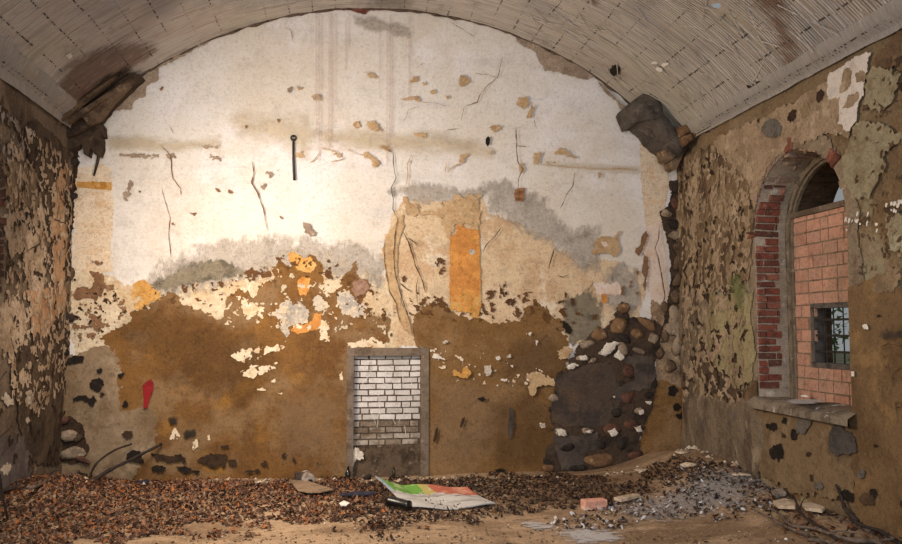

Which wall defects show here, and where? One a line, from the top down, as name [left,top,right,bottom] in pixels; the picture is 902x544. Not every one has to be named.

water stain [82,68,133,108]
crack [403,62,502,130]
spalling [842,92,859,109]
spalling [839,67,868,93]
spalling [874,30,902,92]
crack [251,162,267,227]
water stain [149,236,385,296]
crack [310,147,426,331]
flaking render [591,231,621,257]
flaking render [1,390,15,407]
flaking render [25,375,56,417]
flaking render [0,433,34,489]